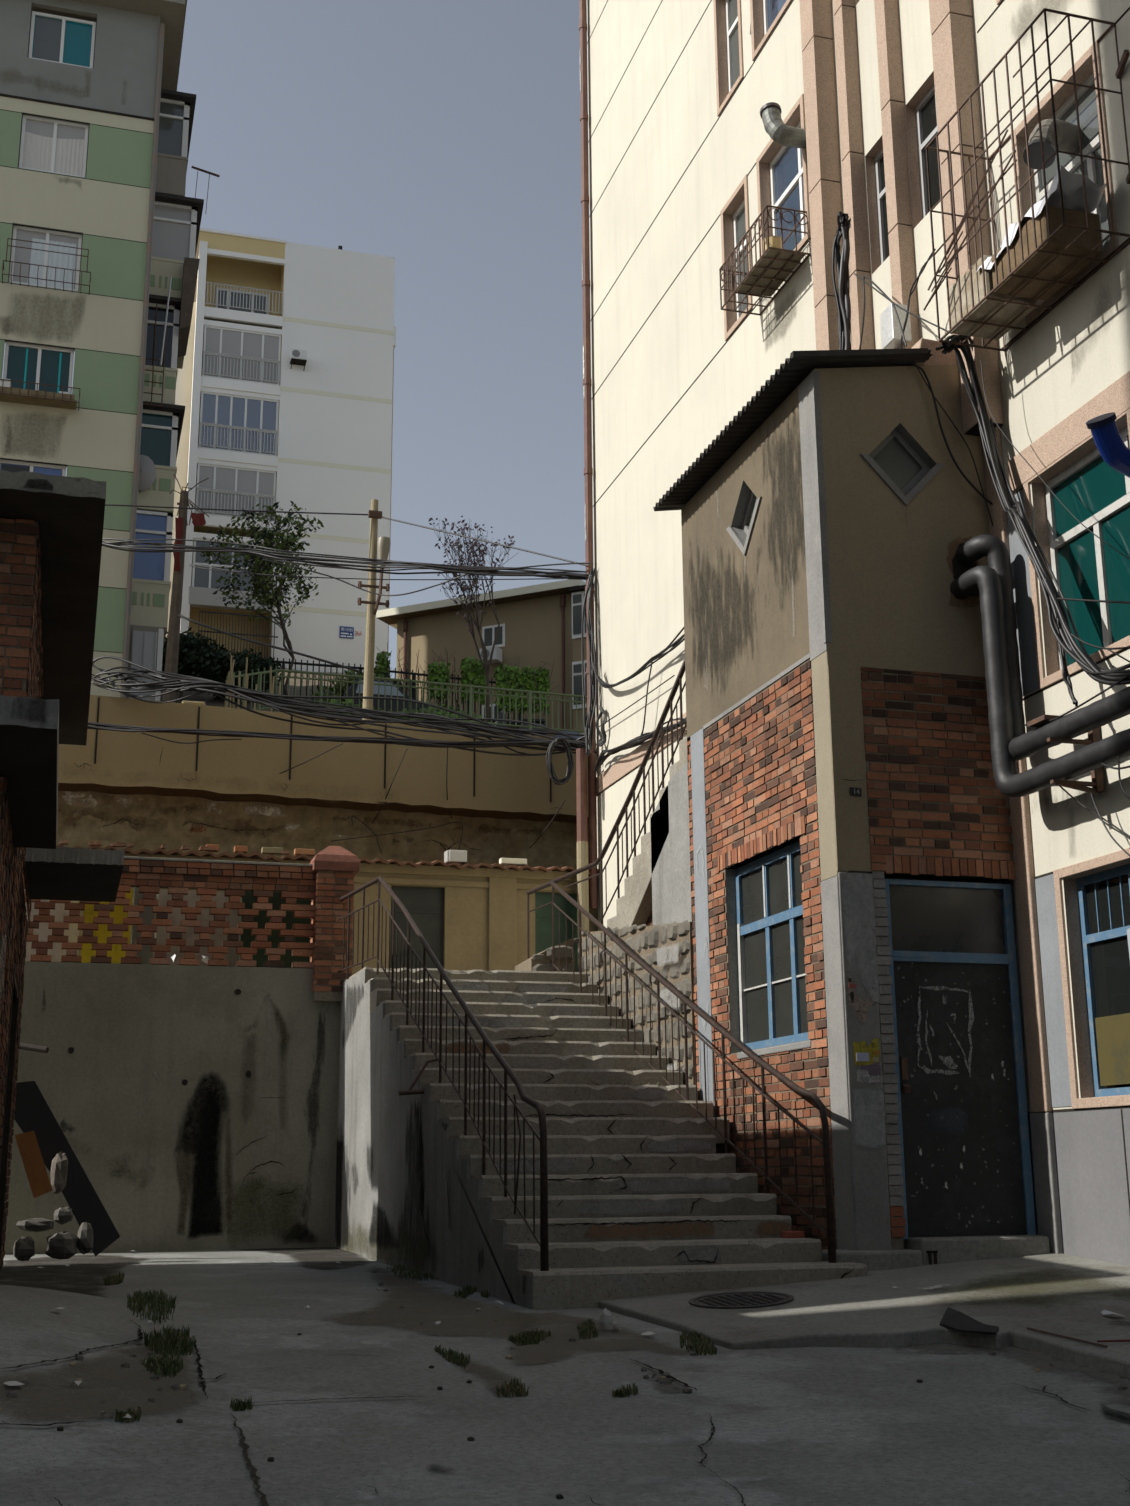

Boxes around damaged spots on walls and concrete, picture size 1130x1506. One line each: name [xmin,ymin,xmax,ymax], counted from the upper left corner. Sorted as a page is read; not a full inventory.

leakage [691,557,752,679]
leakage [308,1016,324,1143]
leakage [342,986,364,1045]
leakage [177,1075,231,1237]
leakage [335,1103,435,1268]
crack [630,1359,746,1506]